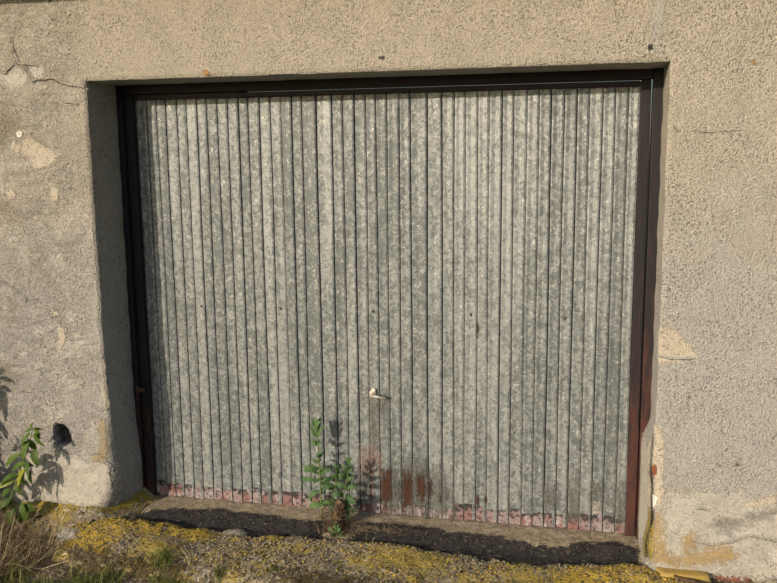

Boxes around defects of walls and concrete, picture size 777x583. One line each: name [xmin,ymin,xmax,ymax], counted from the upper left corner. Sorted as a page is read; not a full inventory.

crack [0,37,88,106]
corrosion [360,455,441,513]
peeling [541,424,777,583]
spalling [54,520,516,583]
crack [691,534,777,546]